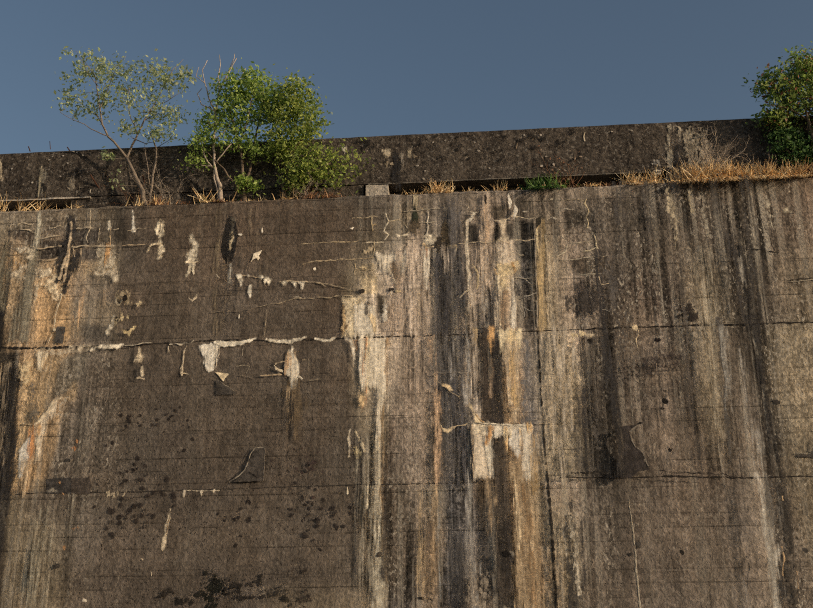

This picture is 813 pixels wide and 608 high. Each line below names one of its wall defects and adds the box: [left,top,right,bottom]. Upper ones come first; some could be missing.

leakage [0,211,82,347]
leakage [0,296,152,556]
leakage [185,236,198,277]
leakage [168,338,256,376]
crack [0,210,499,381]
leakage [260,296,390,608]
leakage [354,192,538,608]
leakage [550,234,639,608]
leakage [665,188,679,240]
leakage [688,175,798,608]
leakage [21,508,53,608]